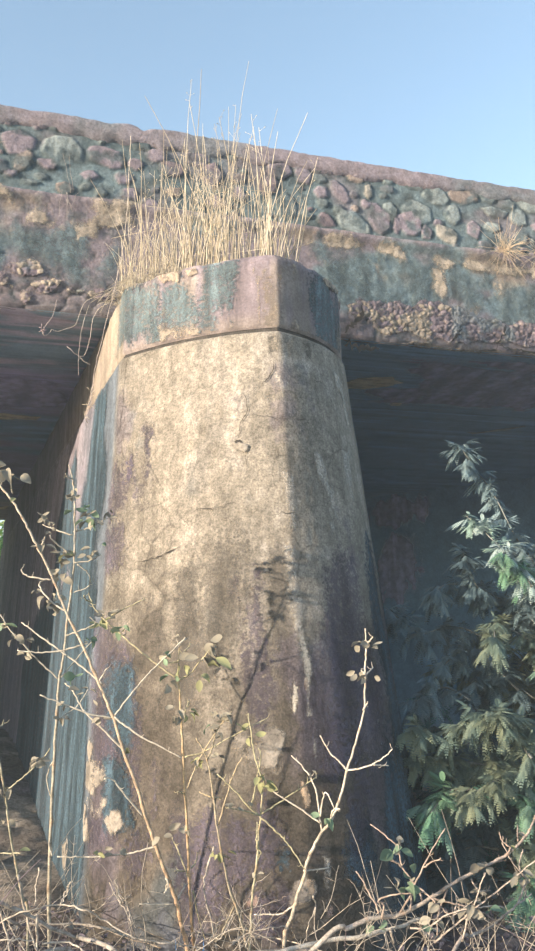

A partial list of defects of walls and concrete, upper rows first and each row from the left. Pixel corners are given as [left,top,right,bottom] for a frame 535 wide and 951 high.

spalling [0,259,110,304]
water stain [114,260,240,350]
water stain [307,239,397,356]
flaking render [324,232,406,260]
spalling [346,254,535,348]
water stain [410,262,483,311]
crack [239,351,309,464]